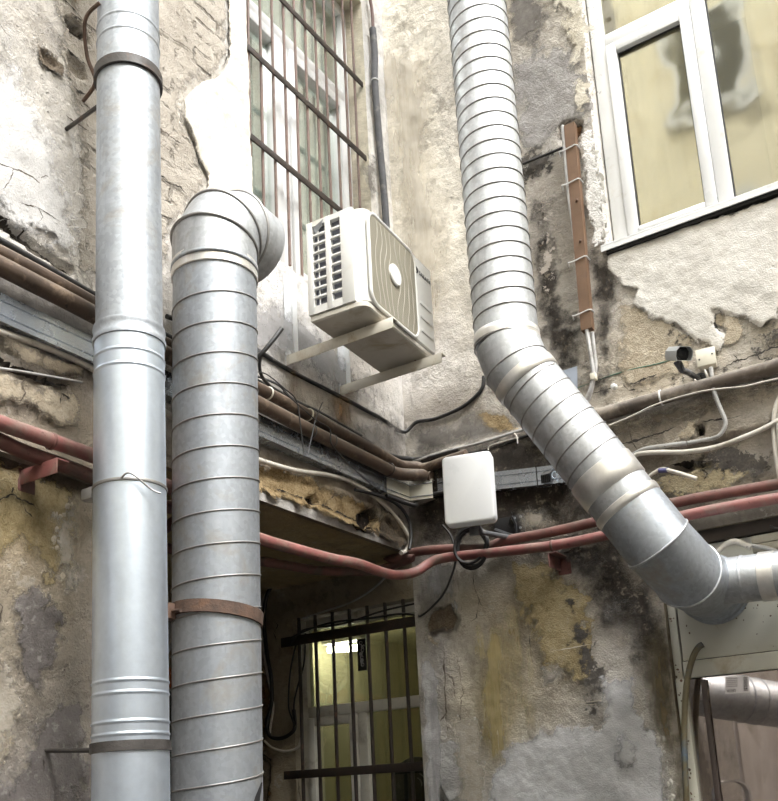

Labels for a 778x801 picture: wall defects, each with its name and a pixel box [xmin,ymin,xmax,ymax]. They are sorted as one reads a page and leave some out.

water stain [509,0,547,47]
crack [0,163,48,189]
flaking render [38,0,97,272]
flaking render [159,0,228,259]
peeling [512,0,610,247]
crack [0,202,73,275]
water stain [531,203,581,370]
water stain [589,251,615,356]
spalling [0,370,81,425]
peeling [0,461,78,594]
crack [440,648,464,736]
water stain [562,591,608,715]